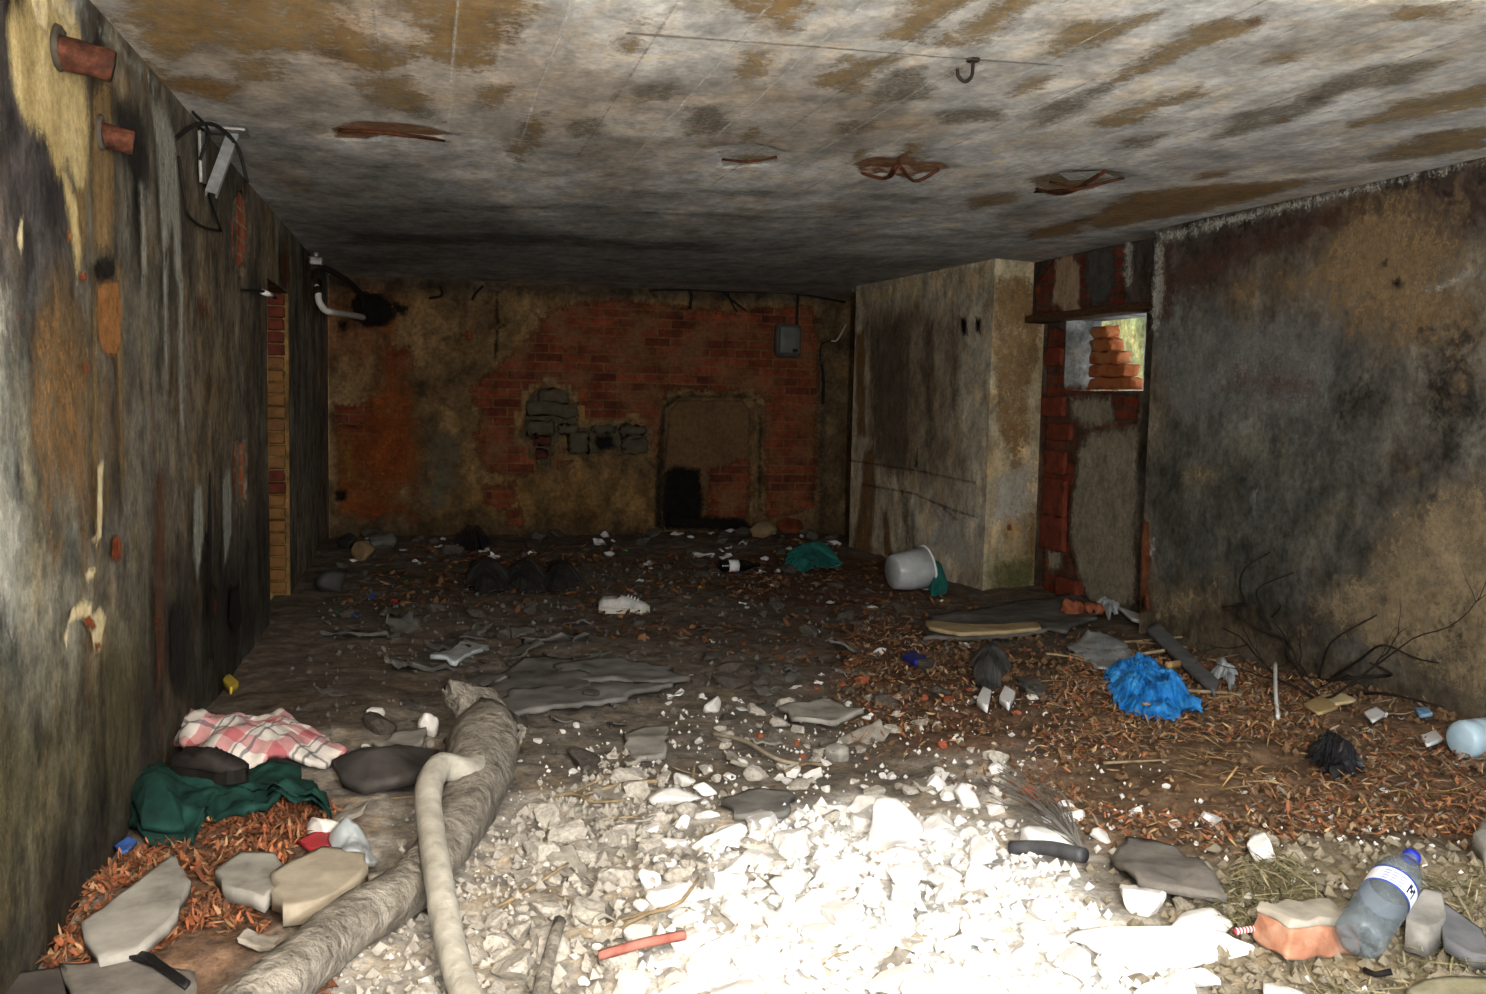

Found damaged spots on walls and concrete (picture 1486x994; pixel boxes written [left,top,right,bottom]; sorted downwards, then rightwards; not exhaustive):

peeling [8,0,122,356]
peeling [110,0,540,143]
spalling [816,0,1035,183]
spalling [967,170,1125,210]
peeling [1095,86,1211,150]
peeling [1150,61,1486,334]
leakage [91,81,184,563]
flaking render [1035,242,1143,616]
leakage [1430,330,1476,449]
efflorescence [0,478,25,613]
efflorescence [194,486,203,575]
leakage [223,470,231,561]